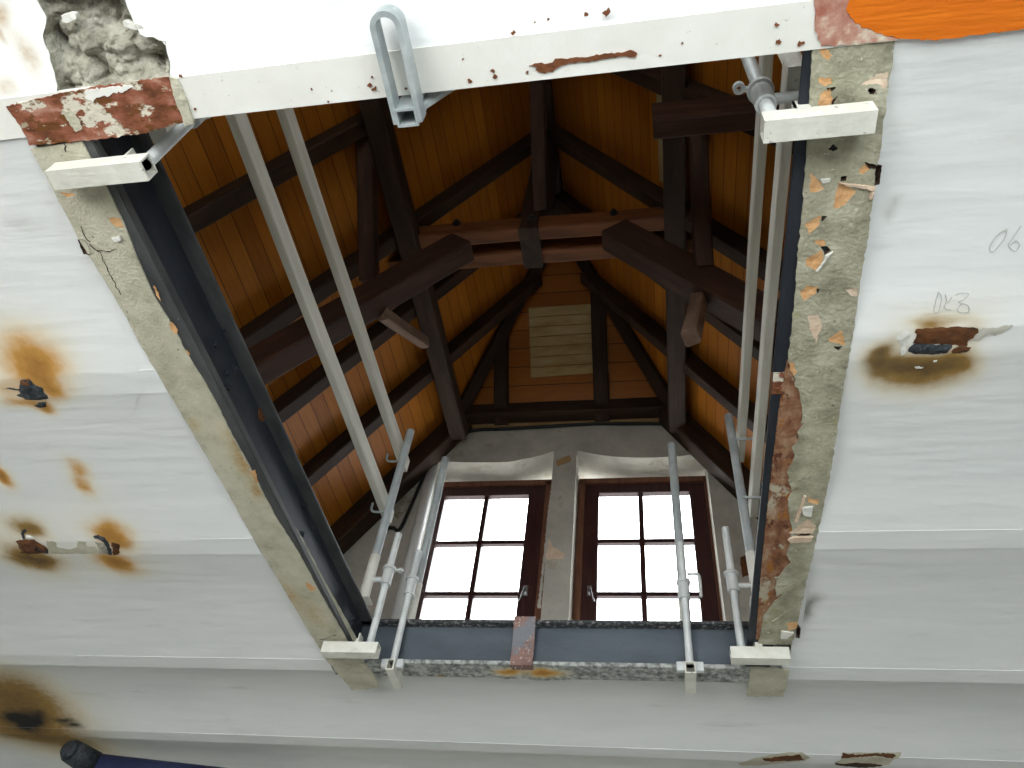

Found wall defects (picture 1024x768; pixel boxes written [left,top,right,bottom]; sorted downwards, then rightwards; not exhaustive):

spalling [37,0,170,91]
corrosion [526,50,637,74]
spalling [818,77,837,106]
spalling [861,72,888,94]
spalling [805,162,882,272]
crack [78,227,121,295]
spalling [807,315,846,350]
corrosion [913,326,979,353]
peeling [974,325,1013,341]
corrosion [0,263,209,604]
corrosion [756,359,810,639]
flaking render [46,541,98,554]